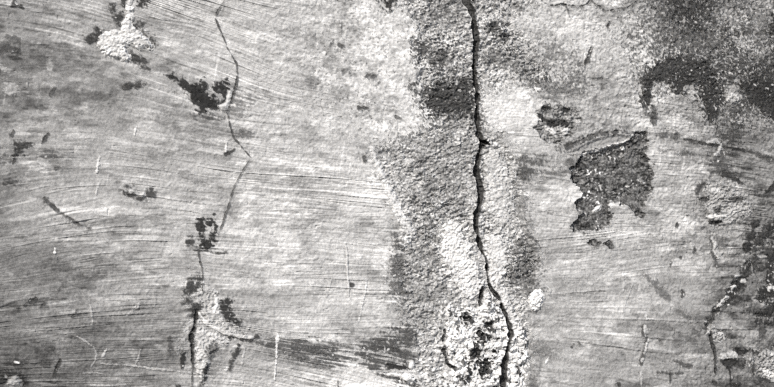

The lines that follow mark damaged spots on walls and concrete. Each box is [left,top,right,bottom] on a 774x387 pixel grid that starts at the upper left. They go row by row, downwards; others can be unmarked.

crack [215,2,250,229]
crack [462,0,514,387]
spalling [534,104,655,249]
leakage [636,0,734,127]
leakage [678,136,774,162]
leakage [738,12,774,121]
crack [188,309,198,384]
crack [441,329,457,371]